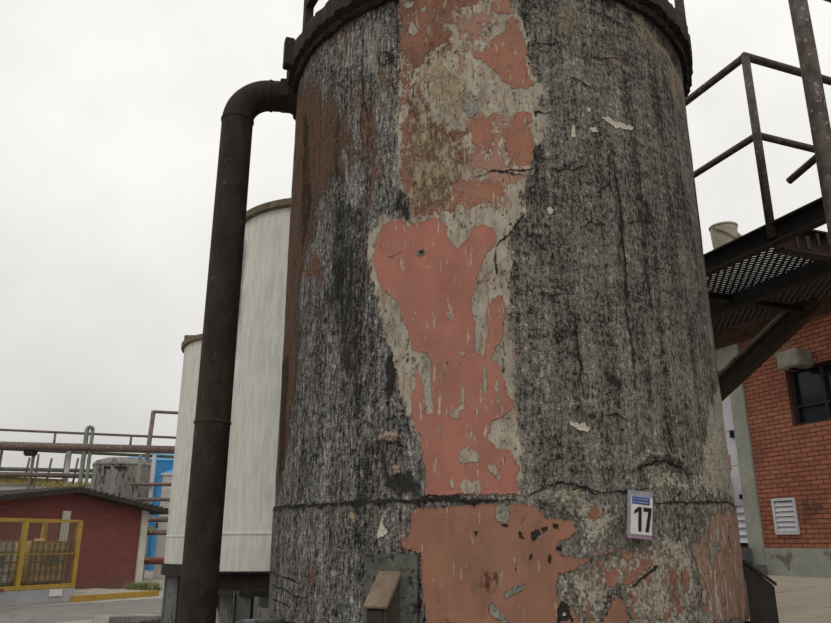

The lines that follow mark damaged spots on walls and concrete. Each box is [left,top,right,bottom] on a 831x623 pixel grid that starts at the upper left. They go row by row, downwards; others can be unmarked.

crack [476,161,589,177]
crack [494,213,526,274]
crack [582,148,653,383]
peeling [367,0,750,623]
crack [573,309,585,398]
crack [276,459,737,509]